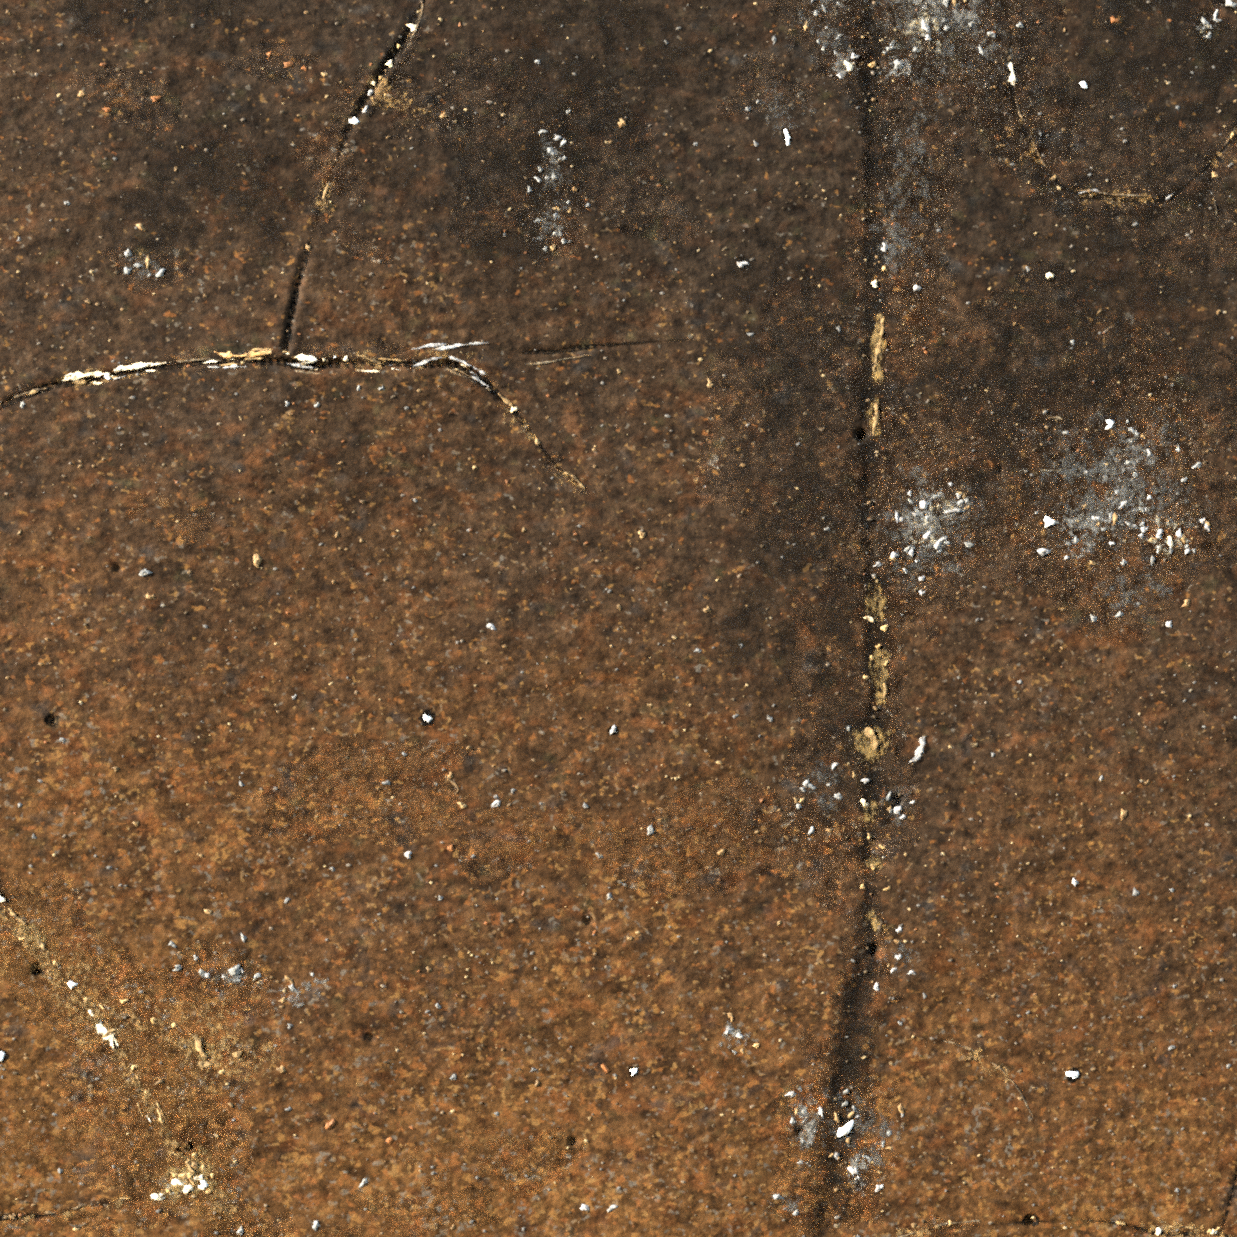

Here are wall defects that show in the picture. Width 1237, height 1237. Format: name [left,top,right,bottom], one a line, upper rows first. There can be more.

crack [1219,0,1237,15]
damp [865,0,1024,83]
corrosion [78,82,133,112]
crack [338,0,449,155]
crack [0,240,586,491]
corrosion [446,772,468,809]
damp [796,762,843,810]
corrosion [717,833,767,858]
damp [886,927,916,975]
crack [0,896,280,1237]
damp [785,1086,904,1190]
corrosion [312,1219,369,1236]